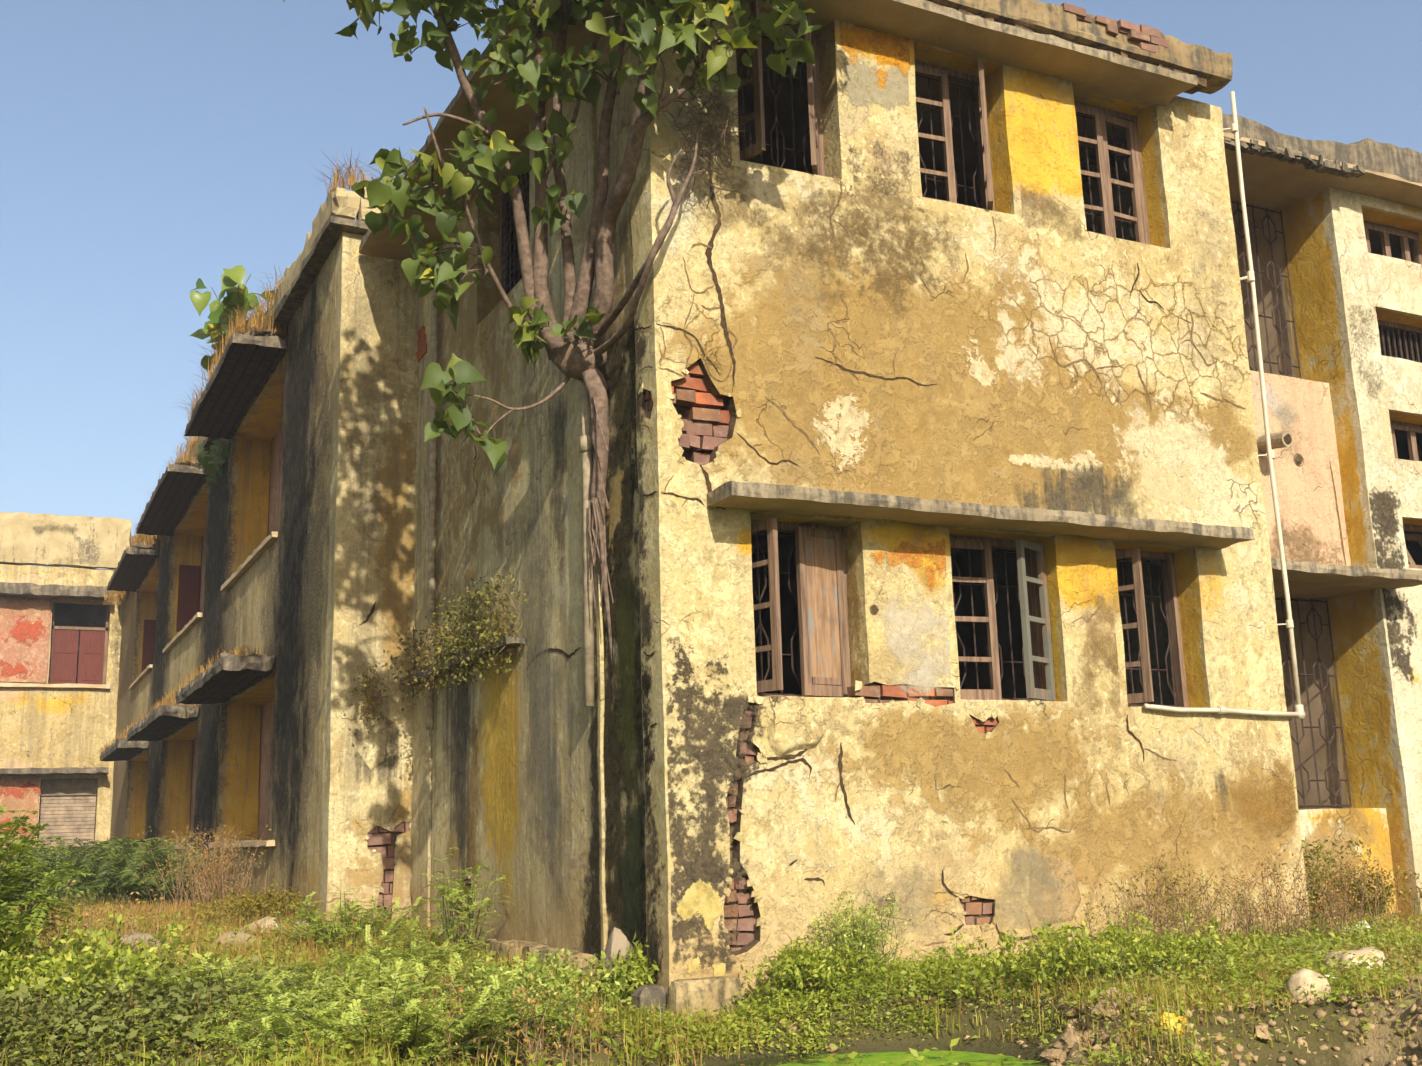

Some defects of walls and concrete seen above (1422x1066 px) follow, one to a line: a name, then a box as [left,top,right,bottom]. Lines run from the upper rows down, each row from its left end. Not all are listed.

crack [630,159,821,467]
crack [815,332,935,386]
spalling [634,361,741,466]
peeling [813,394,873,471]
damp [1369,486,1405,569]
damp [267,282,320,902]
damp [580,324,768,984]
spalling [847,680,959,709]
damp [1381,588,1417,681]
crack [747,743,855,825]
spalling [688,868,766,977]
crack [905,870,1082,946]